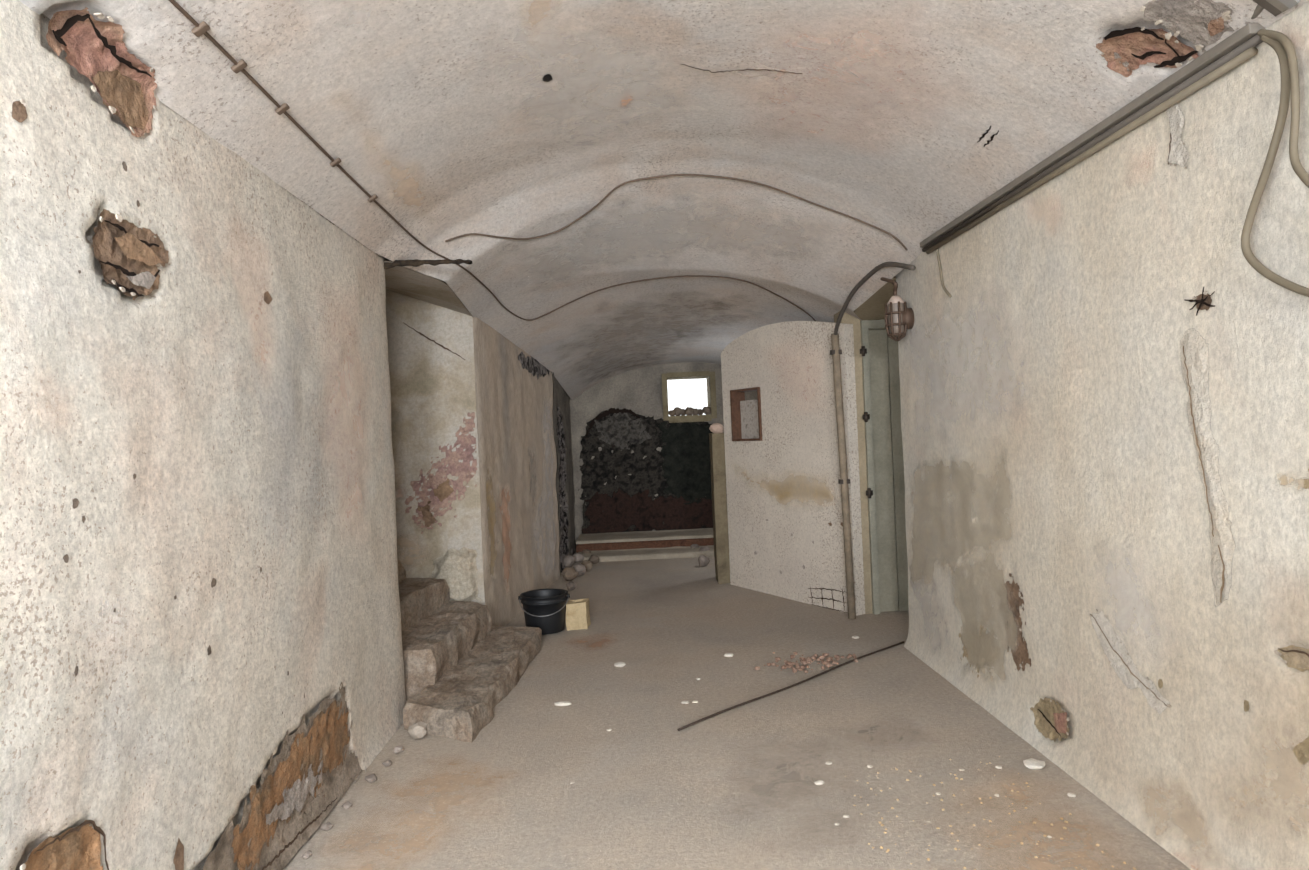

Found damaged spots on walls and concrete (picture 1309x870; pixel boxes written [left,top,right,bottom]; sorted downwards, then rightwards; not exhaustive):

spalling [202,682,367,870]
spalling [20,820,109,870]
spalling [173,838,184,870]